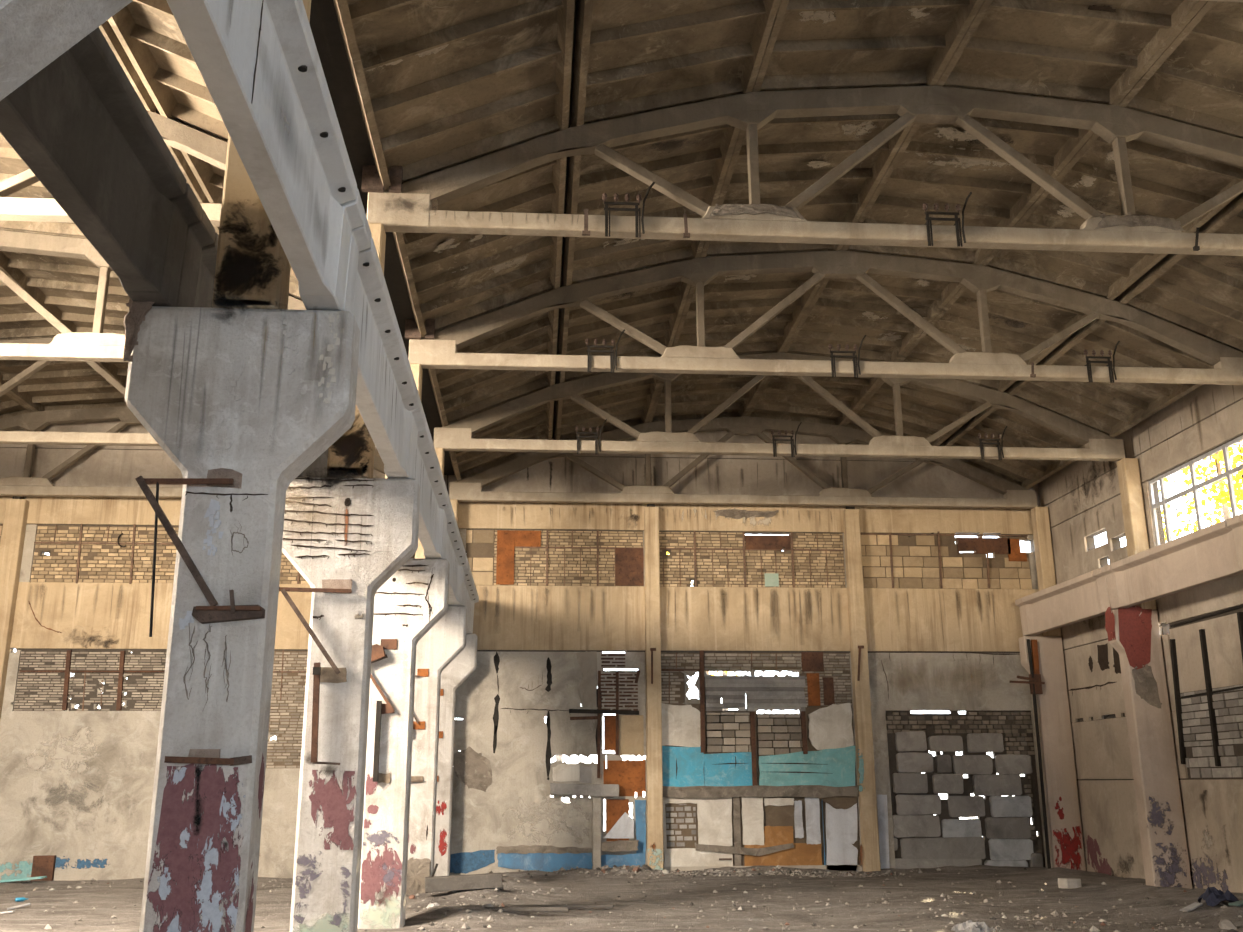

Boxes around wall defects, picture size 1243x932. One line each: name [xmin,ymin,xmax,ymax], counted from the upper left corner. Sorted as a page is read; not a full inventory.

crack [185,477,374,559]
crack [374,564,434,627]
crack [183,625,231,710]
peeling [1088,605,1162,709]
spalling [453,746,493,792]
peeling [55,856,109,870]
peeling [147,753,265,932]
peeling [294,770,448,932]
peeling [1053,797,1112,876]
peeling [1147,797,1228,892]